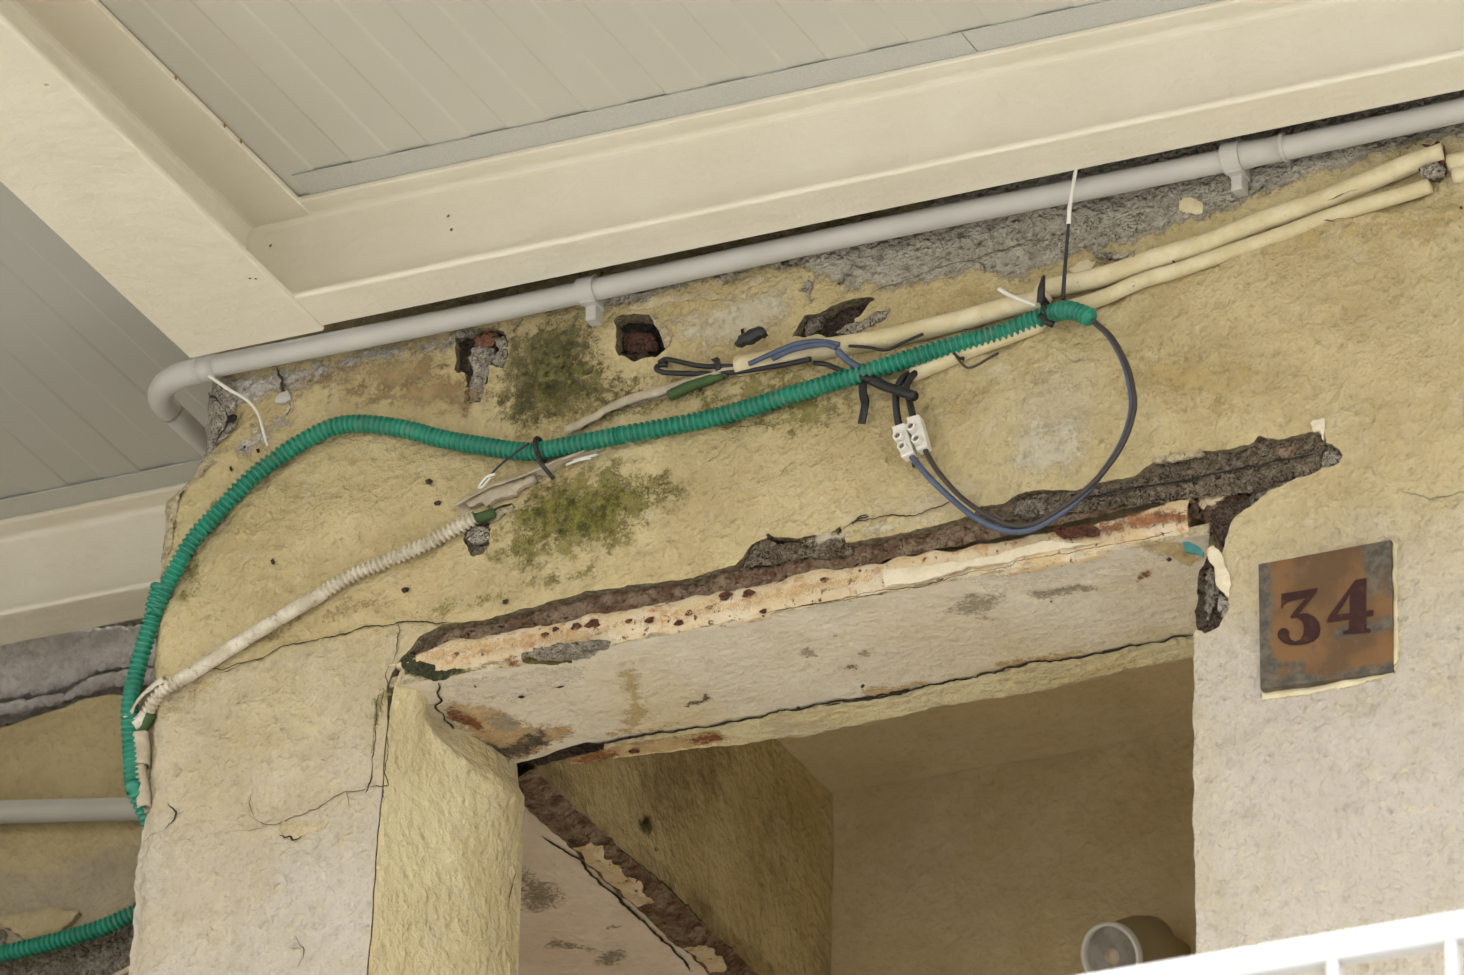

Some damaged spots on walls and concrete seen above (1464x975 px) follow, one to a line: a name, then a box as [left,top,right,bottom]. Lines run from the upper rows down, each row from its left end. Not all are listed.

flaking render [900,90,1464,213]
flaking render [604,123,1464,362]
flaking render [160,328,514,582]
spalling [740,524,898,571]
spalling [985,418,1343,633]
crack [213,621,454,831]
rust [441,701,575,760]
spalling [521,639,611,665]
rust [421,570,872,667]
crack [588,635,1192,745]
crack [145,804,184,841]
peeling [573,842,654,907]